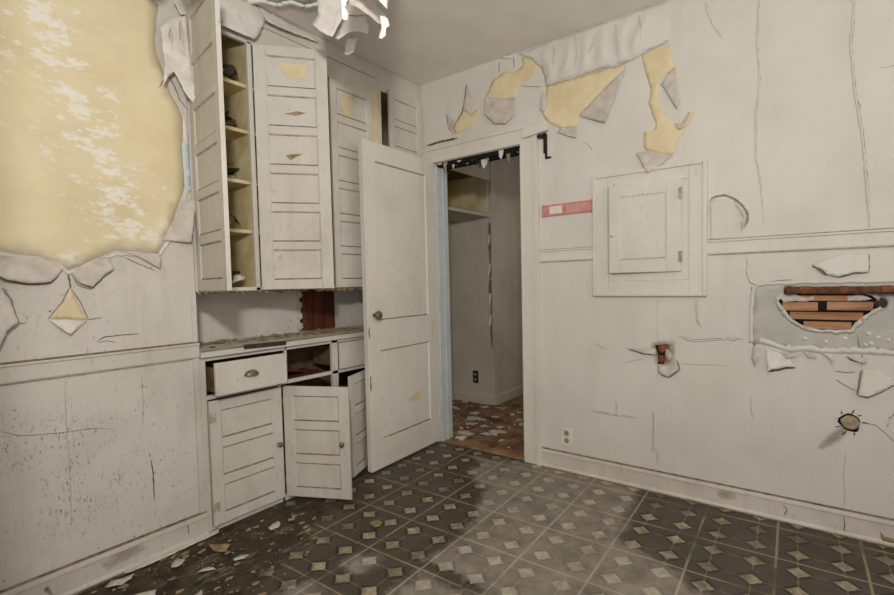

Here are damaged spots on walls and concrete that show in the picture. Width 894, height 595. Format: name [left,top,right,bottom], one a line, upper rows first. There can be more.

peeling [246,0,390,55]
peeling [0,0,192,346]
crack [754,0,763,211]
crack [849,0,870,229]
flaking render [296,289,335,332]
flaking render [627,344,680,378]
flaking render [749,279,894,399]
crack [836,410,886,532]